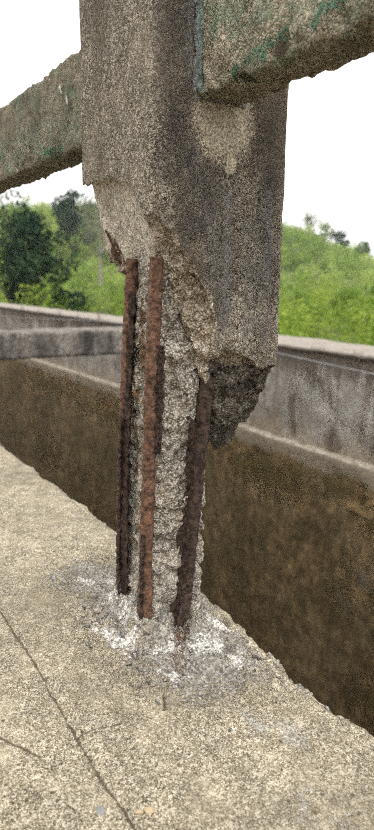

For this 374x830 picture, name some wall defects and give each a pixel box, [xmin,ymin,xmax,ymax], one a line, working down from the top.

crack [0,611,136,830]
spalling [43,177,350,721]